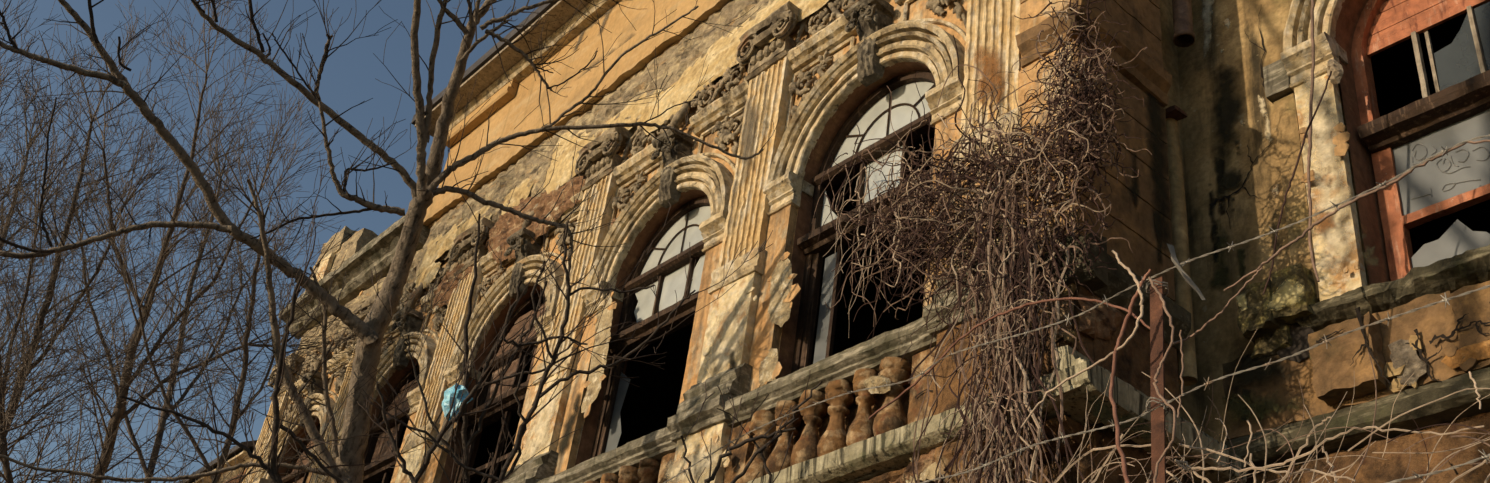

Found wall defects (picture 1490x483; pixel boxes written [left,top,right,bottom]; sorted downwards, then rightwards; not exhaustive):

spalling [403,0,829,313]
water stain [1131,0,1196,351]
water stain [1209,66,1241,262]
spalling [295,274,388,358]
peeling [703,251,801,373]
spalling [755,348,783,388]
water stain [1179,382,1200,428]
spalling [1384,335,1490,394]